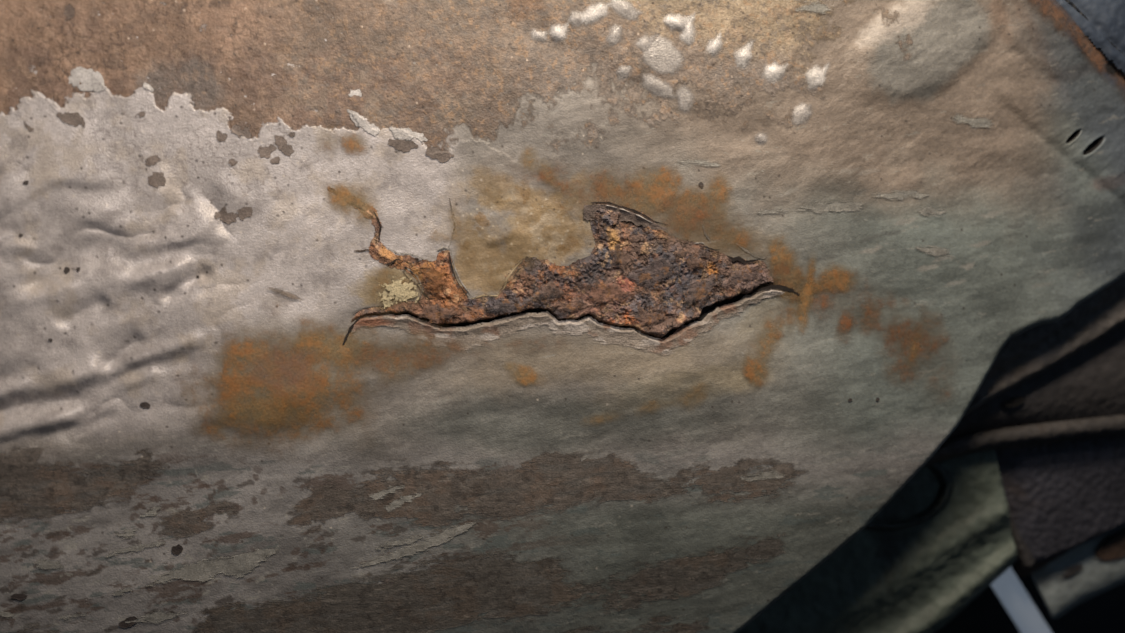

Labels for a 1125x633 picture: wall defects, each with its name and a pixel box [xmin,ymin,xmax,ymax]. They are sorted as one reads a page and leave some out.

peeling [146,155,166,188]
peeling [214,206,253,224]
crack [327,187,800,356]
corrosion [744,239,851,385]
corrosion [205,322,434,437]